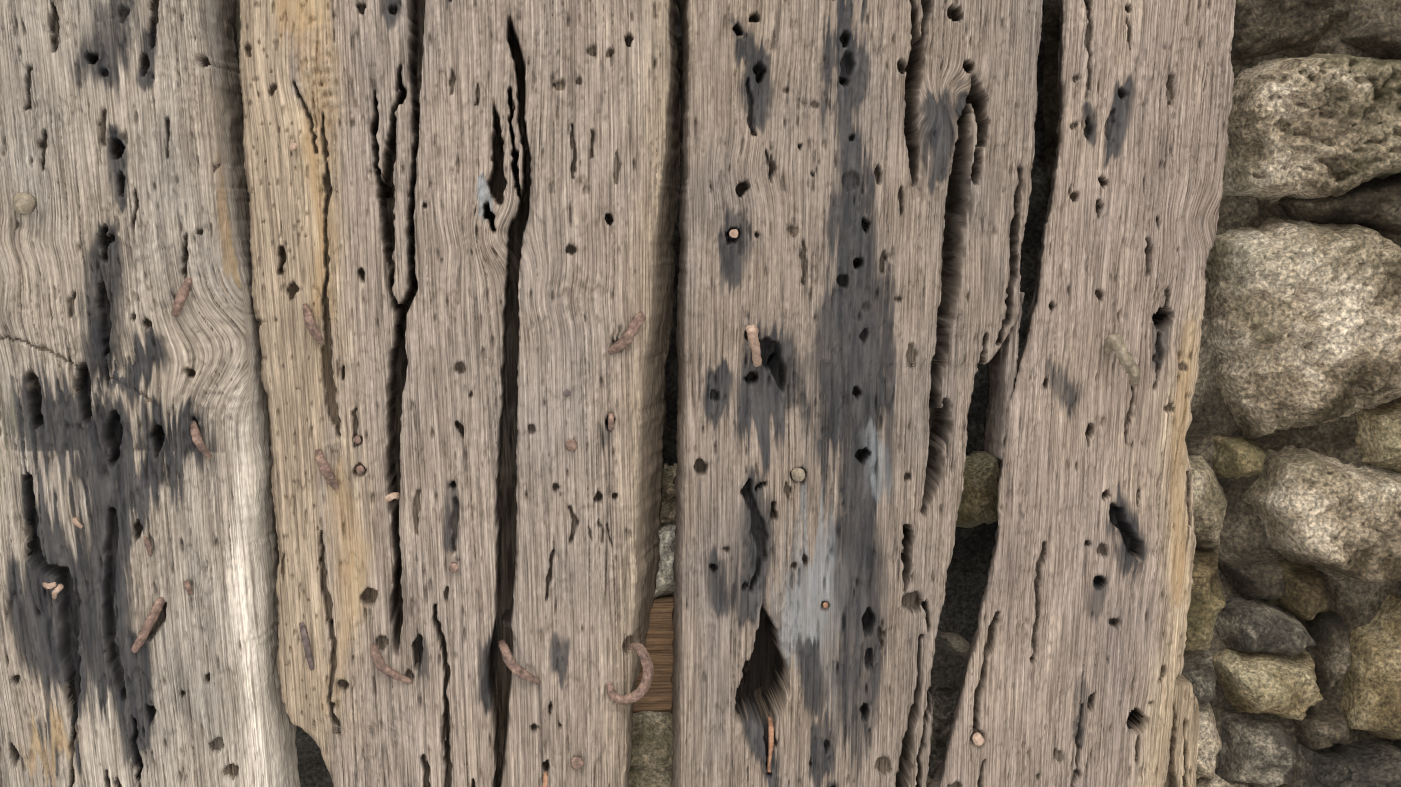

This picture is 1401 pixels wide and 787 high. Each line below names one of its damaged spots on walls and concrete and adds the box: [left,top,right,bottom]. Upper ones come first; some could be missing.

crack [904,1,925,159]
crack [925,96,982,484]
crack [0,335,78,366]
crack [375,0,579,787]
crack [27,524,35,556]
crack [901,524,909,582]
crack [1030,541,1046,659]
crack [973,611,1000,727]
crack [67,681,144,787]
crack [1071,738,1080,787]